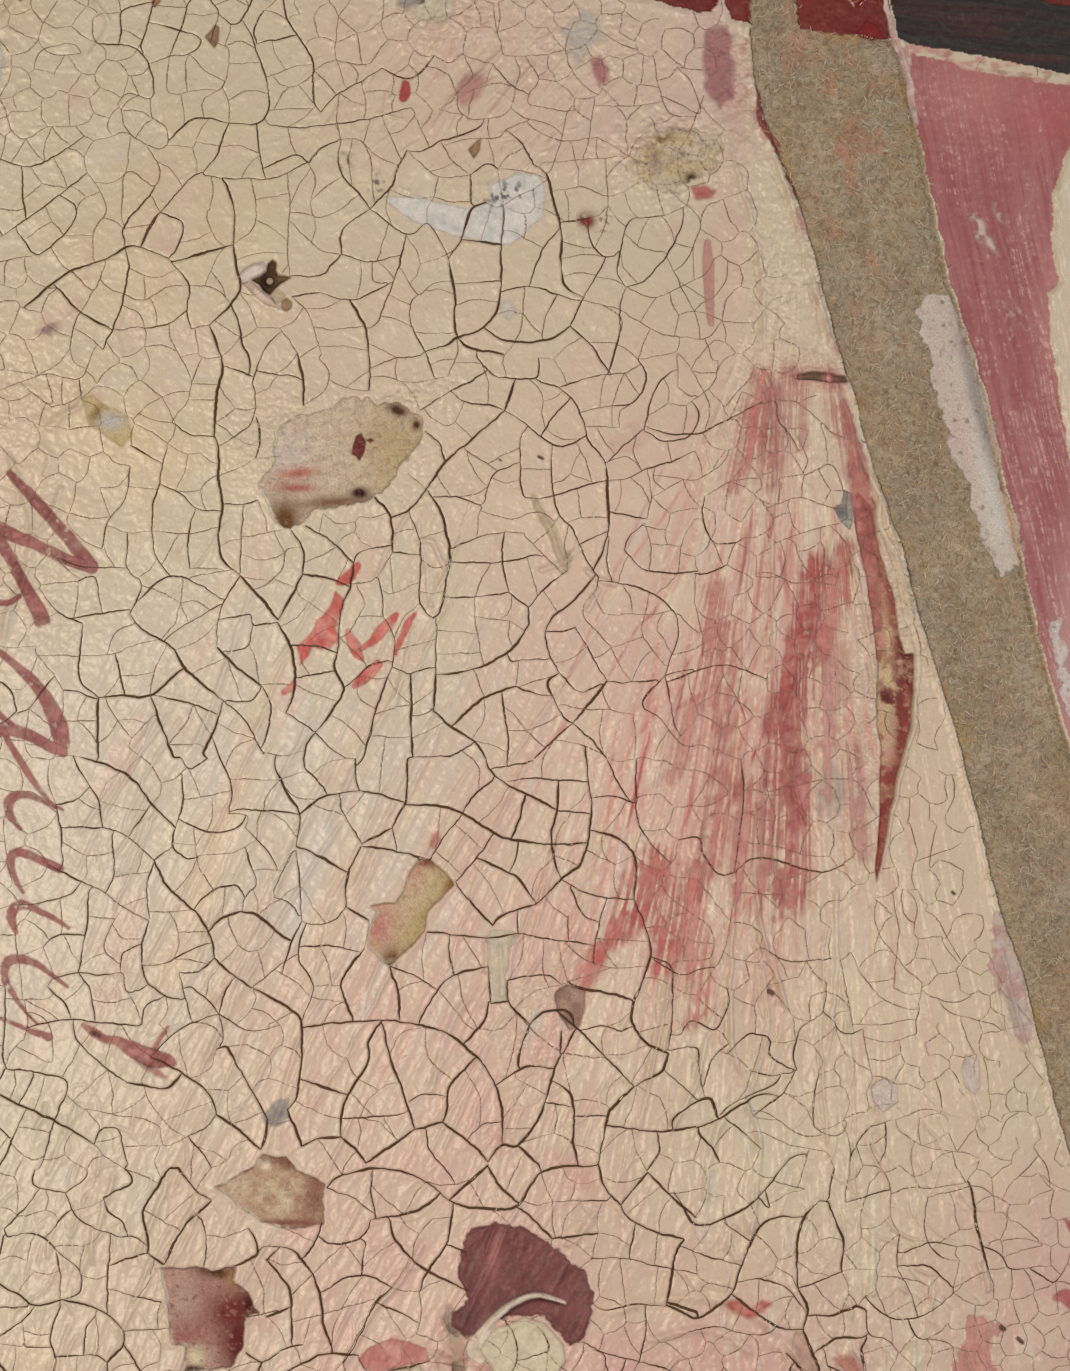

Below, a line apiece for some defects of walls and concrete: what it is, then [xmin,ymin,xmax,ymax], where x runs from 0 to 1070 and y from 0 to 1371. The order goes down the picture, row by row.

crack [0,100,74,139]
crack [24,0,434,349]
peeling [258,396,423,528]
crack [0,108,897,1371]
peeling [367,859,454,965]
peeling [161,1267,259,1371]
peeling [214,1155,325,1229]
crack [866,1161,1067,1346]